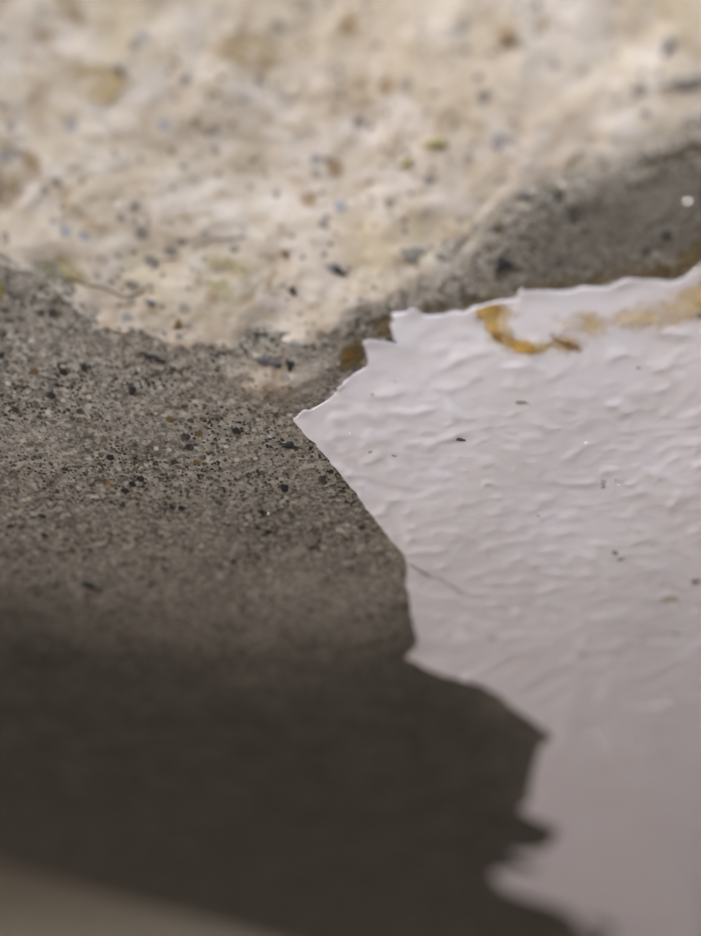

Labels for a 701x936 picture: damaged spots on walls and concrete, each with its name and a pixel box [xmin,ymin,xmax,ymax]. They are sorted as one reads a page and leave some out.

peeling [293,265,701,936]